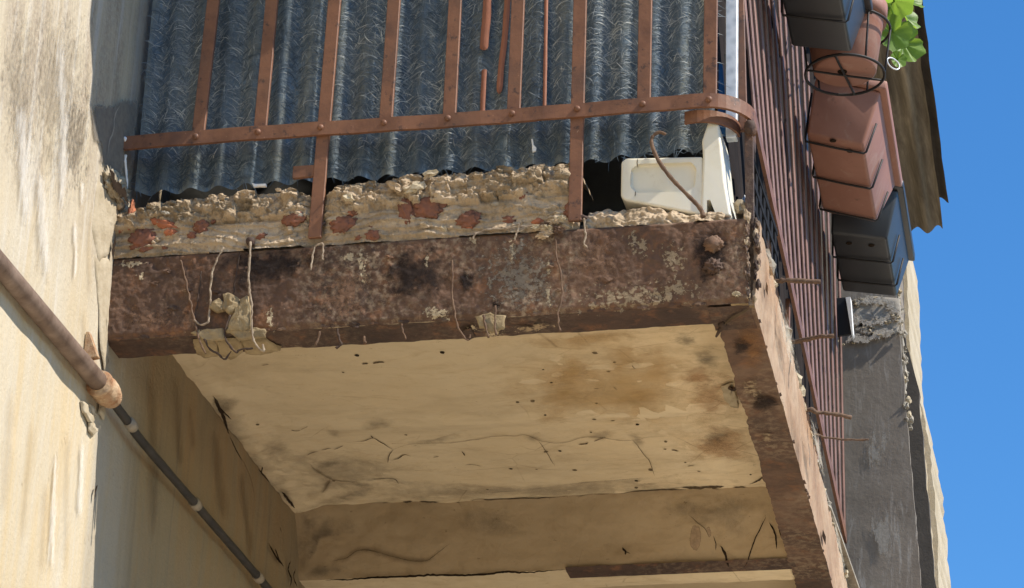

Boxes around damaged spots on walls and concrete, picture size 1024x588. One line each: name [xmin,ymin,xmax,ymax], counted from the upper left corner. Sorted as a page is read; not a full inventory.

flaking render [5,10,147,371]
spalling [649,130,706,218]
rust [217,248,314,286]
rust [386,251,443,296]
rust [460,272,472,290]
rust [693,234,725,280]
spalling [782,288,914,431]
rust [744,381,779,411]
crack [292,427,762,503]
crack [326,546,555,581]
crack [693,518,781,567]